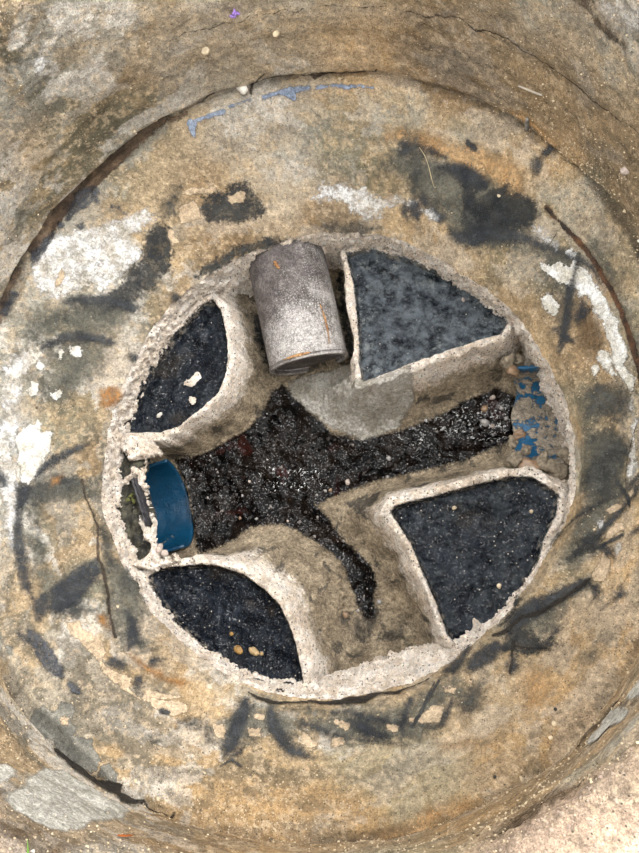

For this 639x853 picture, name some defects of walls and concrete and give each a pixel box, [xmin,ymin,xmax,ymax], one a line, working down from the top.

crack [249,69,377,95]
crack [406,11,639,134]
crack [397,141,447,158]
crack [466,139,477,152]
water stain [194,236,288,280]
water stain [312,137,616,352]
water stain [551,382,639,563]
crack [54,748,175,819]